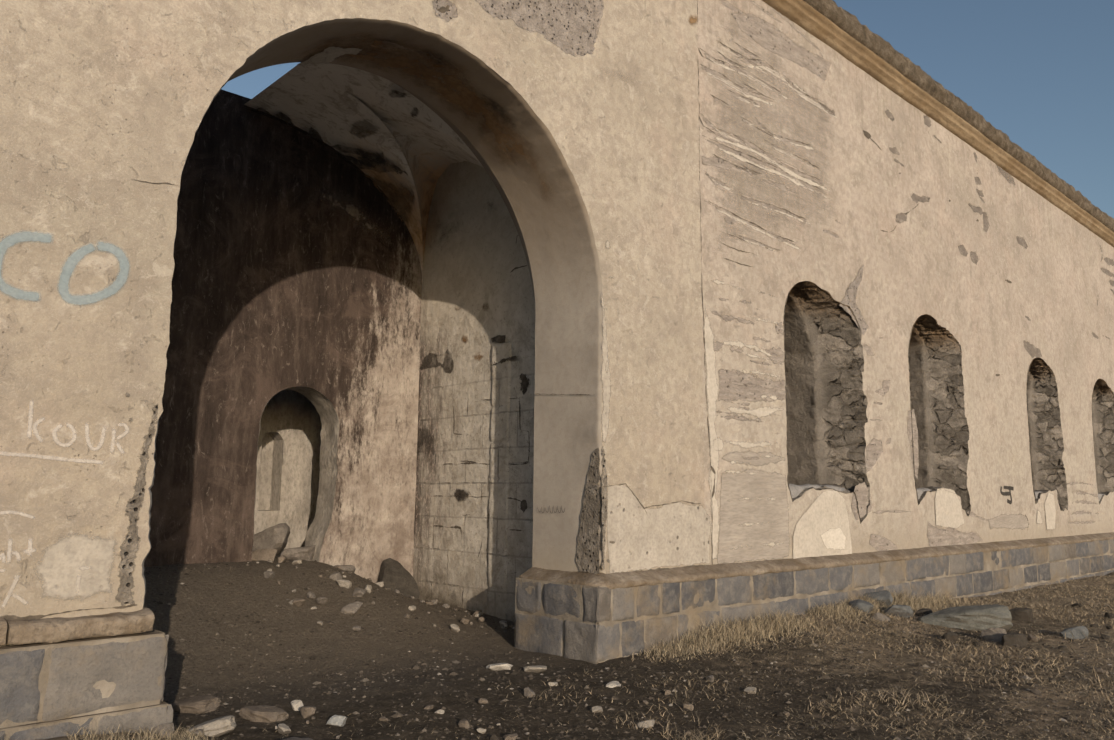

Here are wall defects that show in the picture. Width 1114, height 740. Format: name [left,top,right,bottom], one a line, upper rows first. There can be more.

spalling [476,0,604,56]
peeling [700,0,838,224]
peeling [706,201,799,267]
spalling [881,193,930,232]
spalling [958,245,979,265]
spalling [968,153,990,232]
peeling [712,298,786,422]
peeling [35,405,158,605]
crack [593,373,716,571]
peeling [576,433,790,574]